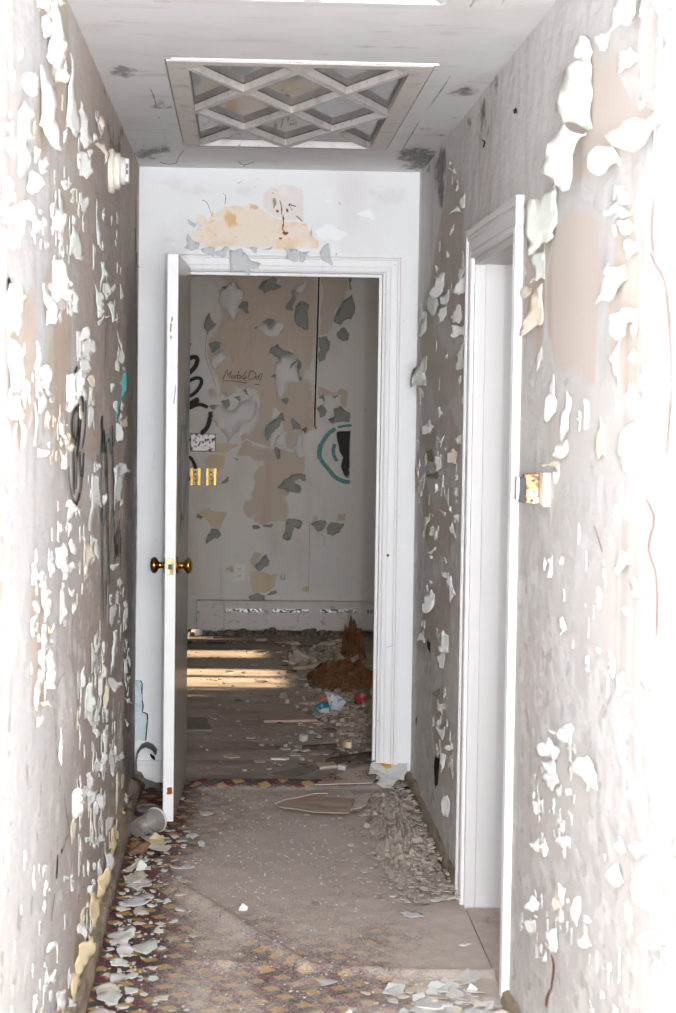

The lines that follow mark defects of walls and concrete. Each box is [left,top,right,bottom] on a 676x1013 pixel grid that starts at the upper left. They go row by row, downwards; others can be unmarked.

peeling [0,0,147,1013]
peeling [248,550,285,600]
peeling [185,183,355,544]
peeling [410,156,466,820]
peeling [519,0,676,488]
peeling [541,317,676,807]
peeling [519,720,617,975]
peeling [601,834,676,916]